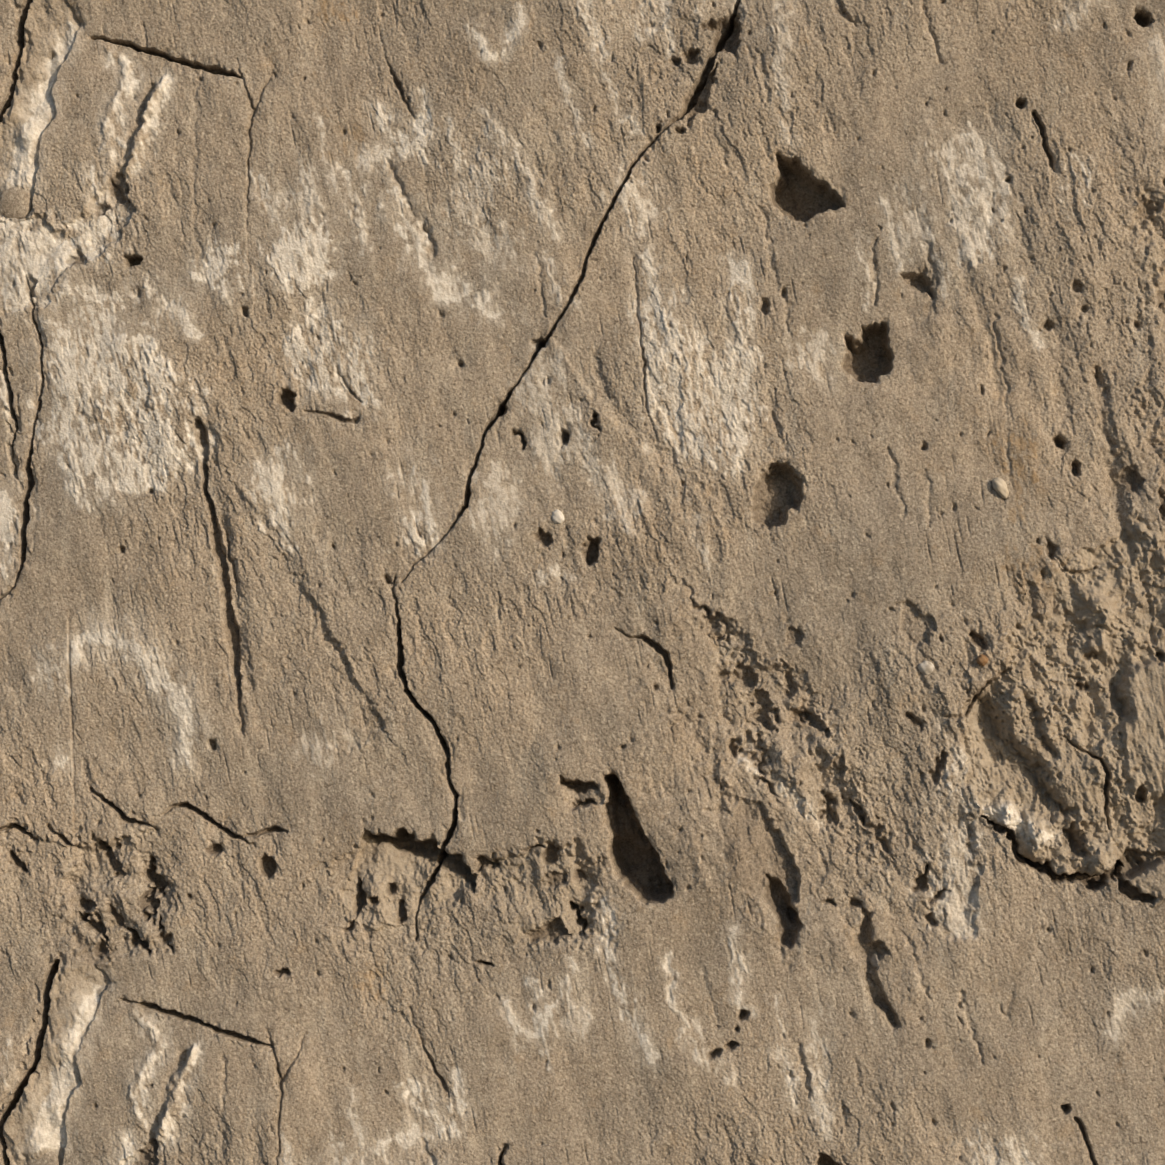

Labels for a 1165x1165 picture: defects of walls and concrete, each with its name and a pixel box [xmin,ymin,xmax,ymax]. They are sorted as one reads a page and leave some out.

crack [0,0,33,125]
crack [832,0,857,27]
crack [0,274,46,601]
crack [390,0,742,943]
crack [0,823,82,850]
crack [88,786,290,848]
crack [0,959,60,1165]
crack [497,1144,510,1165]